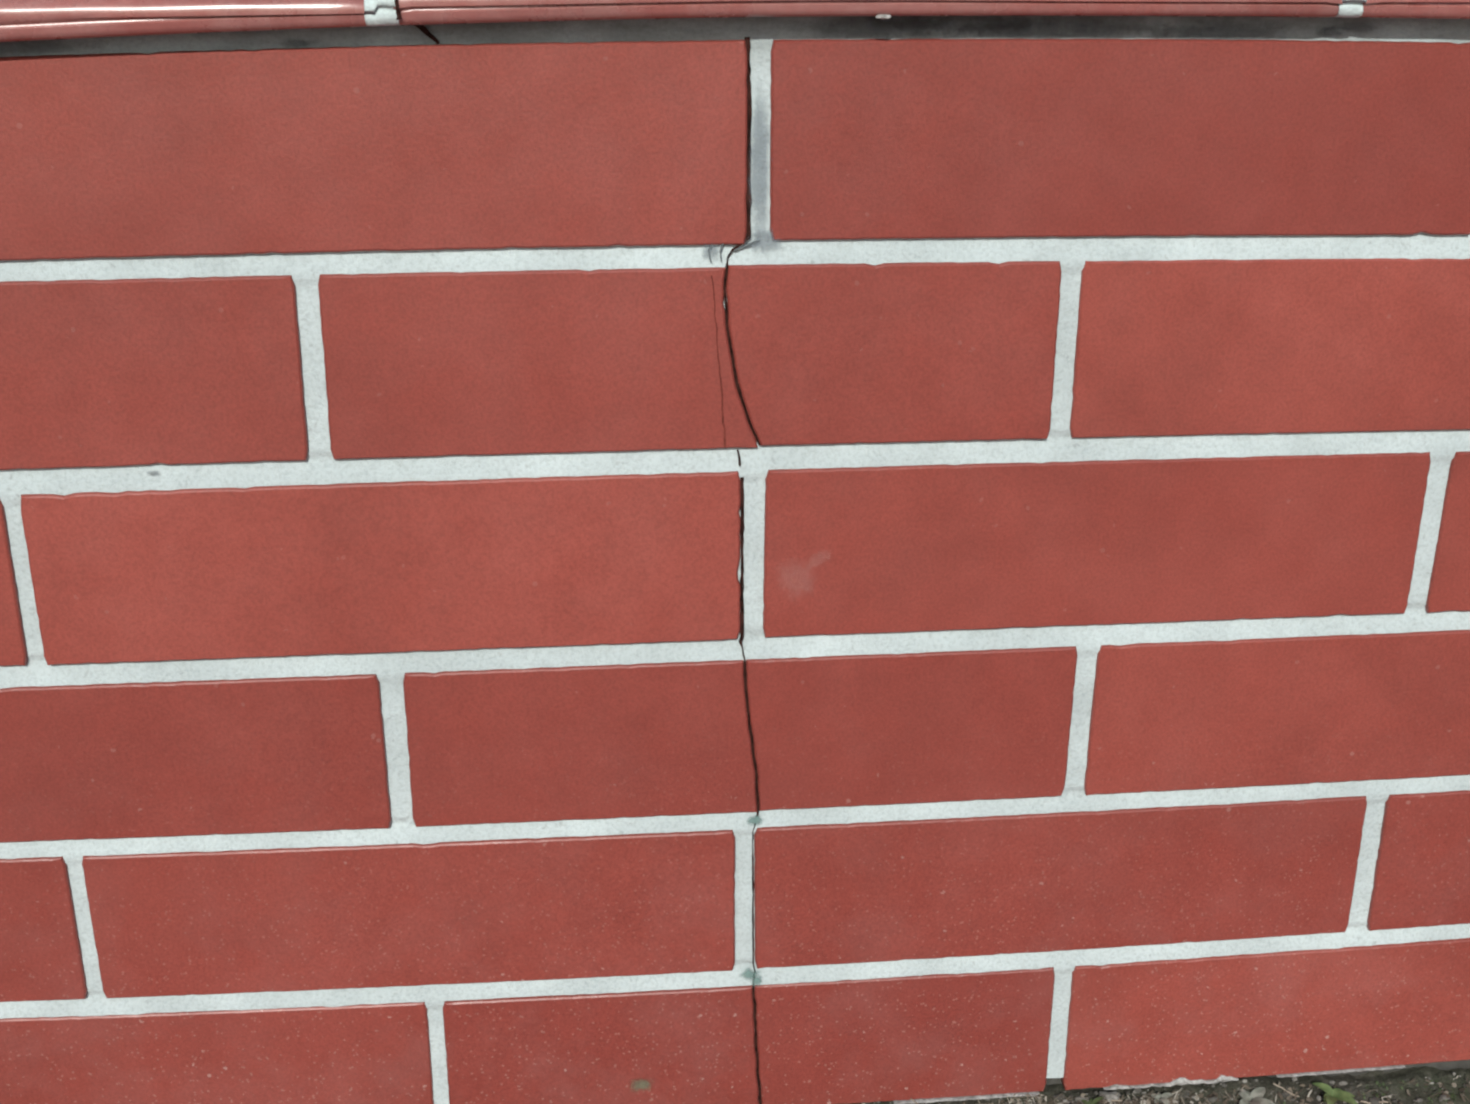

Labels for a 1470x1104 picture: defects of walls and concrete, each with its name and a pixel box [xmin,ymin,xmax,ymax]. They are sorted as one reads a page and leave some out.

crack [708,37,762,1104]